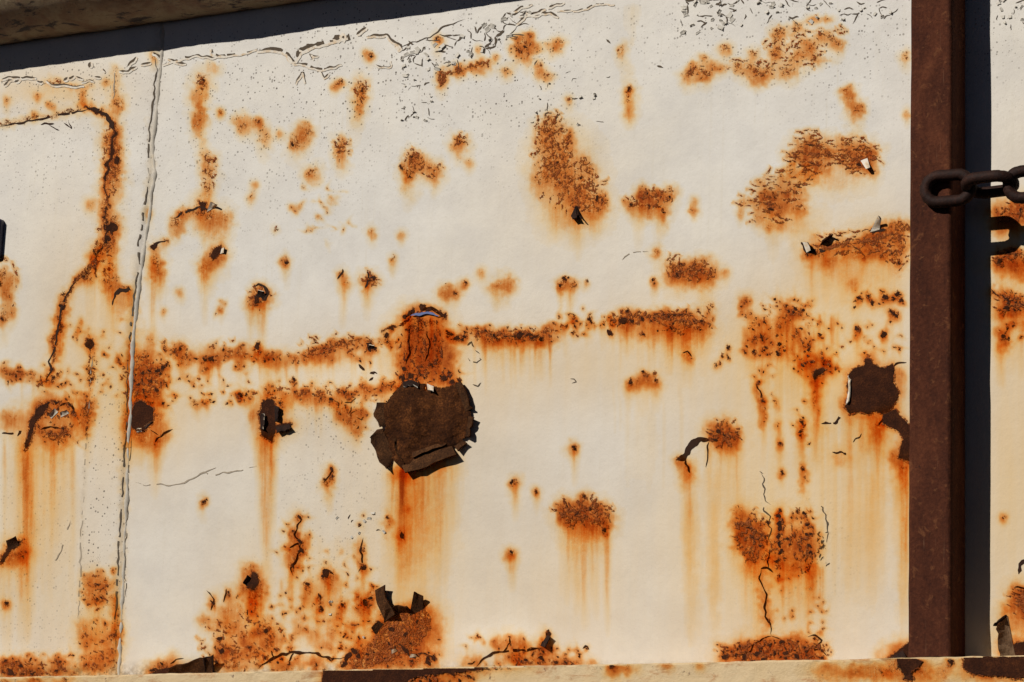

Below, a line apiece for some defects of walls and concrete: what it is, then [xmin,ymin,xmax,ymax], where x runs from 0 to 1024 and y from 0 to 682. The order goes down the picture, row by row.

corrosion [530,111,608,219]
corrosion [735,129,884,226]
crack [0,27,403,654]
corrosion [1,254,716,435]
spalling [257,398,292,443]
spalling [336,380,480,473]
spalling [821,354,910,472]
corrosion [200,515,377,672]
spalling [332,585,440,669]
crack [741,471,779,655]
corrosion [716,587,831,661]
corrosion [732,507,820,591]